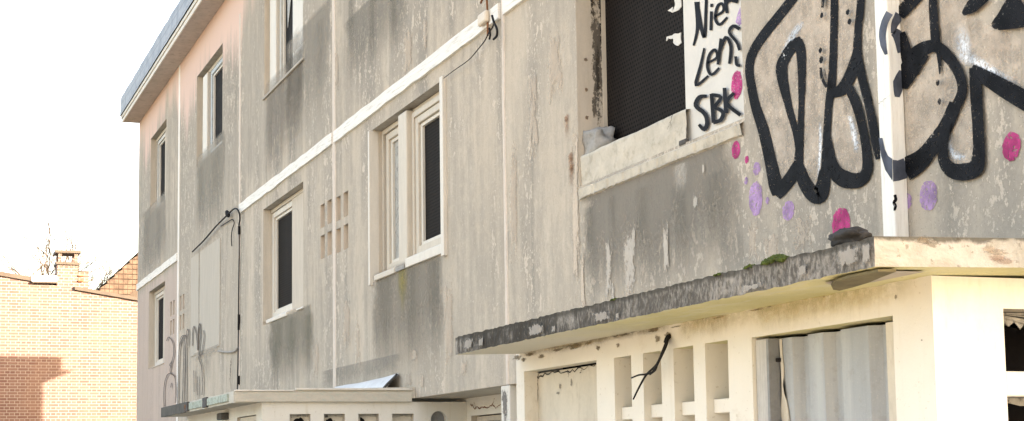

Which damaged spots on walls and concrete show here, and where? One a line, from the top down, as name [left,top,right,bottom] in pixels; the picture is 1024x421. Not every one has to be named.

leakage [347,0,402,49]
leakage [267,3,328,130]
peeling [605,223,636,299]
peeling [748,221,777,260]
spalling [826,243,921,291]
leakage [374,256,440,341]
leakage [270,306,310,358]
crack [537,364,595,394]